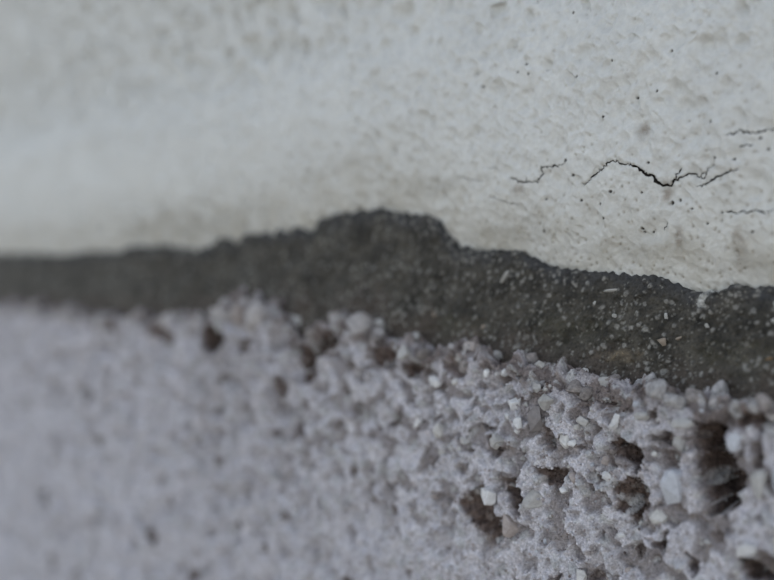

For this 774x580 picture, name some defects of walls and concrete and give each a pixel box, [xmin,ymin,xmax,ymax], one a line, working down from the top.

crack [586,160,738,187]
spalling [141,321,175,345]
spalling [198,321,254,357]
spalling [271,326,340,403]
spalling [371,337,481,388]